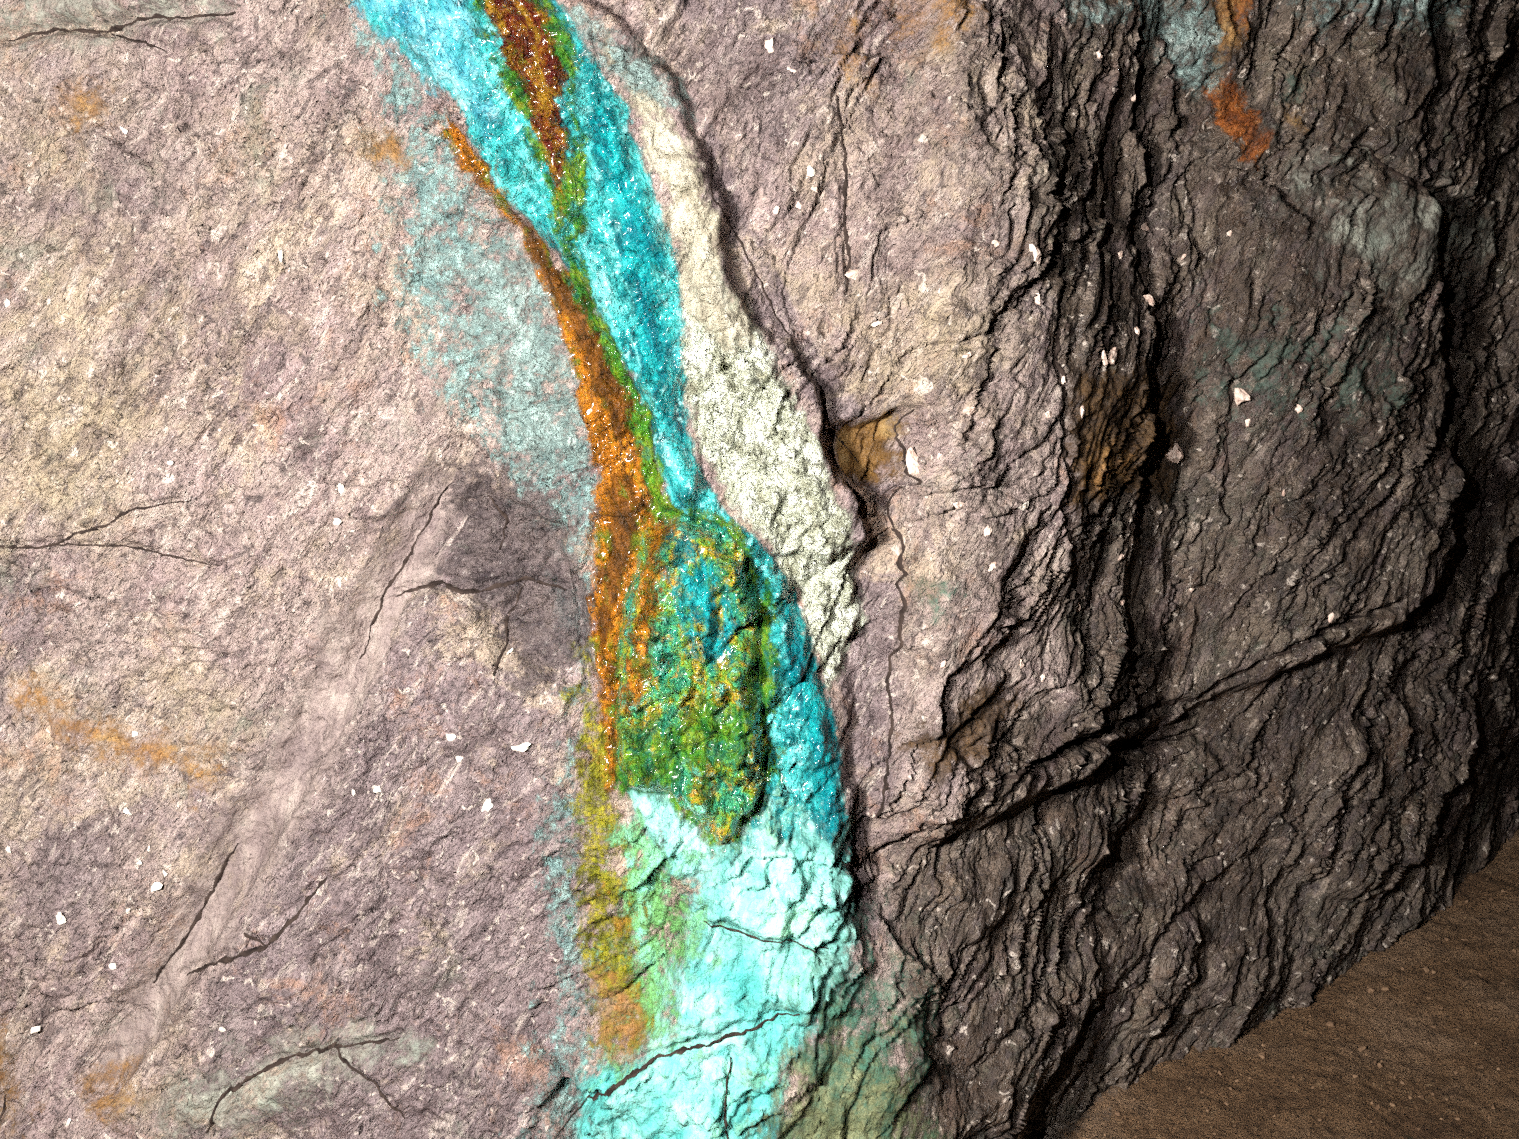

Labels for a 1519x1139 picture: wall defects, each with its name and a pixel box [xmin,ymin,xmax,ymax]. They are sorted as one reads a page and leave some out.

crack [6,12,235,53]
corrosion [1199,0,1274,167]
corrosion [442,0,679,792]
corrosion [836,412,903,483]
crack [1052,188,1079,672]
crack [0,500,220,566]
leakage [352,0,946,1139]
crack [861,409,1392,904]
crack [703,921,827,953]